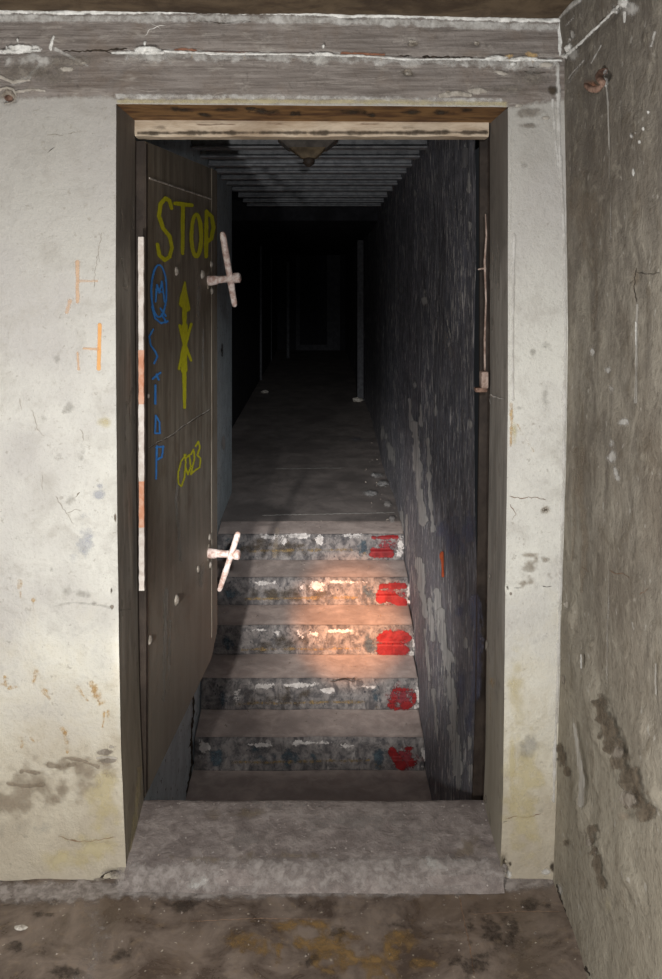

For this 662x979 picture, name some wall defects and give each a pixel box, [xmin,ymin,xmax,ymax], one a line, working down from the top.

water stain [0,0,580,802]
water stain [573,723,584,807]